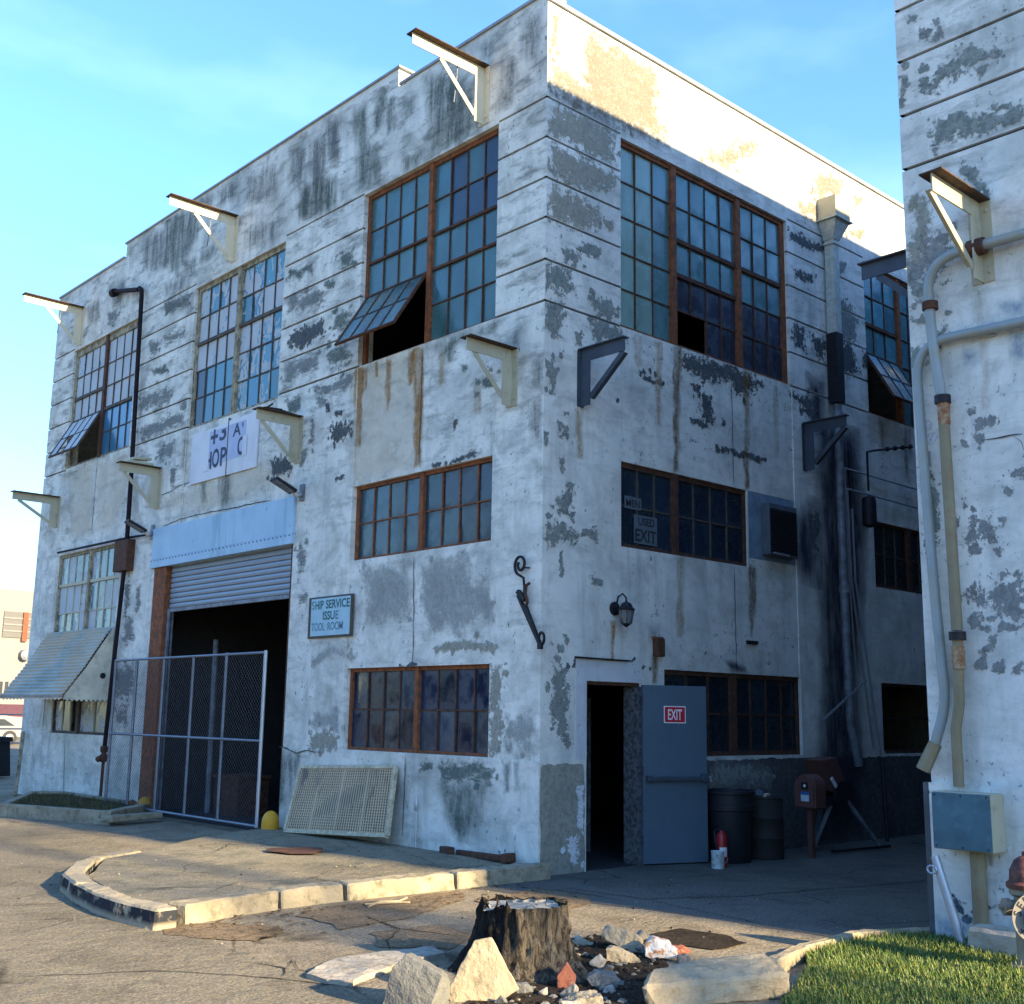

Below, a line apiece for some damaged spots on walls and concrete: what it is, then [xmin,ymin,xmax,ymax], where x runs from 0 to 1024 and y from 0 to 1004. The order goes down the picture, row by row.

damp [291,123,337,216]
damp [354,93,392,184]
peeling [544,8,669,394]
peeling [898,42,1005,108]
peeling [927,99,1024,156]
damp [145,214,196,310]
peeling [281,264,353,449]
corrosion [355,361,390,445]
corrosion [408,348,424,466]
corrosion [656,347,681,470]
damp [798,382,863,833]
peeling [961,569,1024,675]